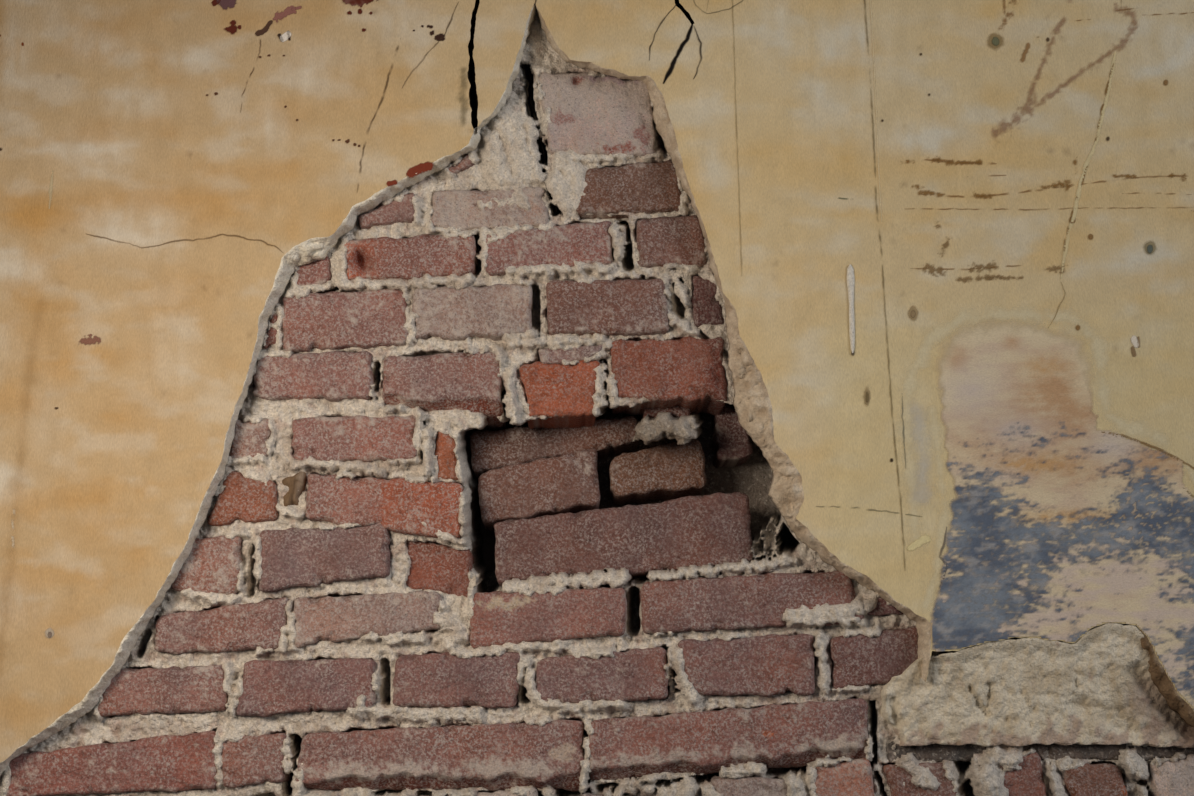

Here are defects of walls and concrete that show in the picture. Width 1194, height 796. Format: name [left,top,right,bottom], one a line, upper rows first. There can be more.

crack [444,0,480,129]
crack [649,0,740,84]
flaking render [0,0,951,796]
peeling [880,307,1194,763]